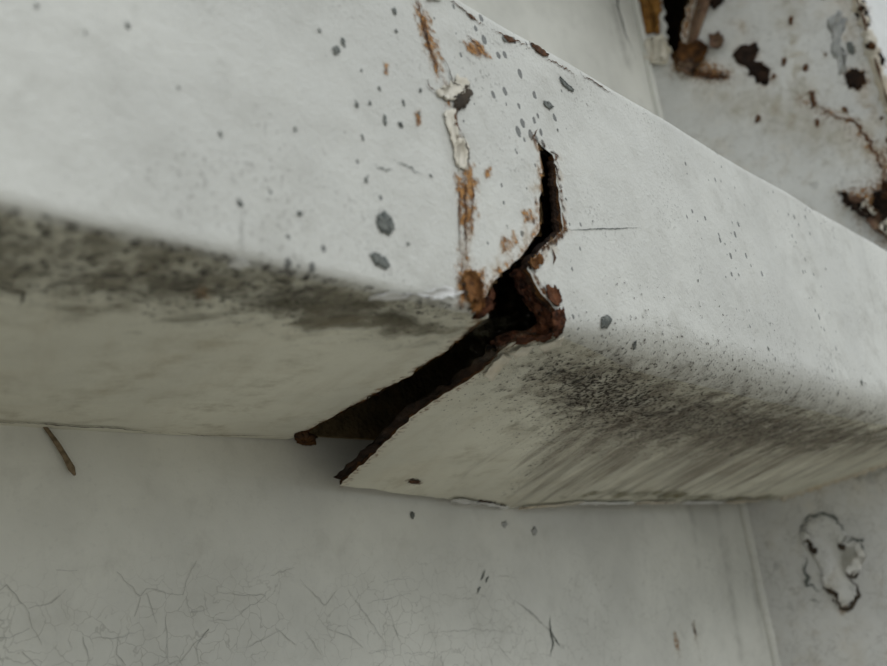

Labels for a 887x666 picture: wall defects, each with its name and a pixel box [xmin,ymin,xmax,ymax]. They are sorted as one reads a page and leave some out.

rust [464,40,491,58]
peeling [708,30,724,49]
peeling [732,42,787,85]
peeling [827,8,871,91]
damp [0,208,472,335]
rust [442,139,568,354]
damp [439,300,887,468]
peeling [799,512,867,612]
crack [83,561,560,666]